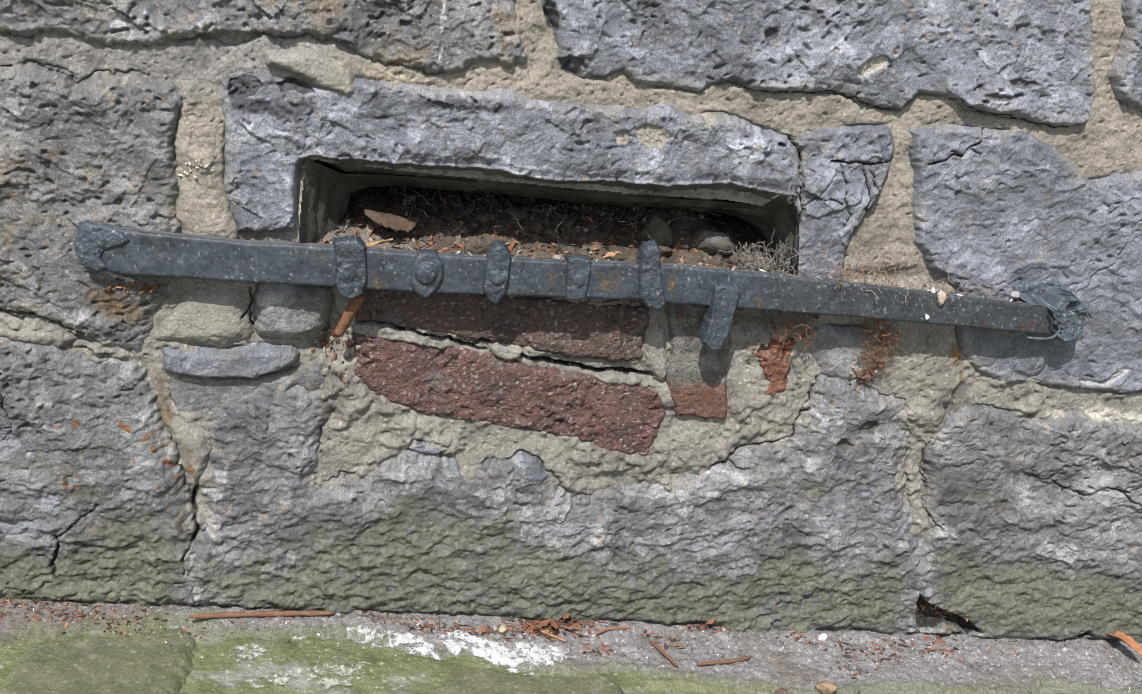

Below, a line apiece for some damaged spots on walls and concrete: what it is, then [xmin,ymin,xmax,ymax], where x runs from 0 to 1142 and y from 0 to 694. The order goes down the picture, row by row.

crack [727,80,899,110]
crack [928,98,1069,164]
crack [779,142,887,226]
crack [710,377,817,471]
crack [51,505,97,576]
crack [183,486,201,568]
spalling [915,594,979,634]
damp [236,644,267,661]
damp [246,663,363,694]
damp [346,622,570,675]